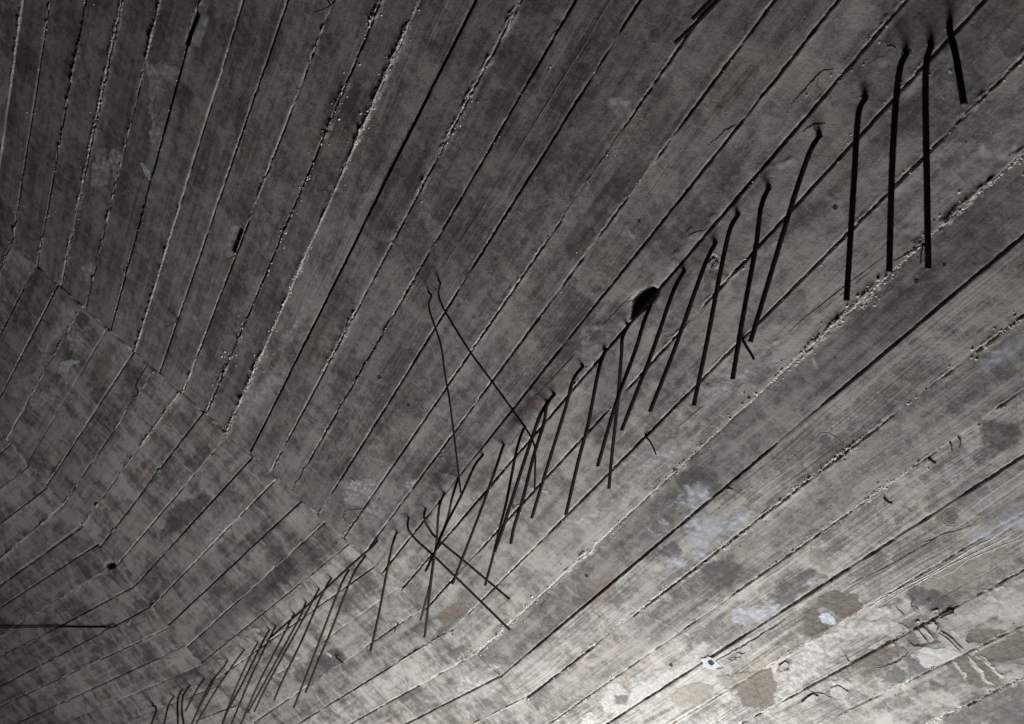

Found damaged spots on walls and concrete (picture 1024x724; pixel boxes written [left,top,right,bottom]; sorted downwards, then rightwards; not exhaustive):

spalling [673,0,721,45]
spalling [944,21,968,108]
spalling [730,131,823,380]
spalling [832,94,870,301]
spalling [886,42,946,273]
spalling [369,211,741,652]
water stain [661,469,751,587]
spalling [151,540,378,724]
spalling [733,658,797,709]
water stain [774,586,949,702]
spalling [850,598,1024,688]
water stain [945,685,1024,724]